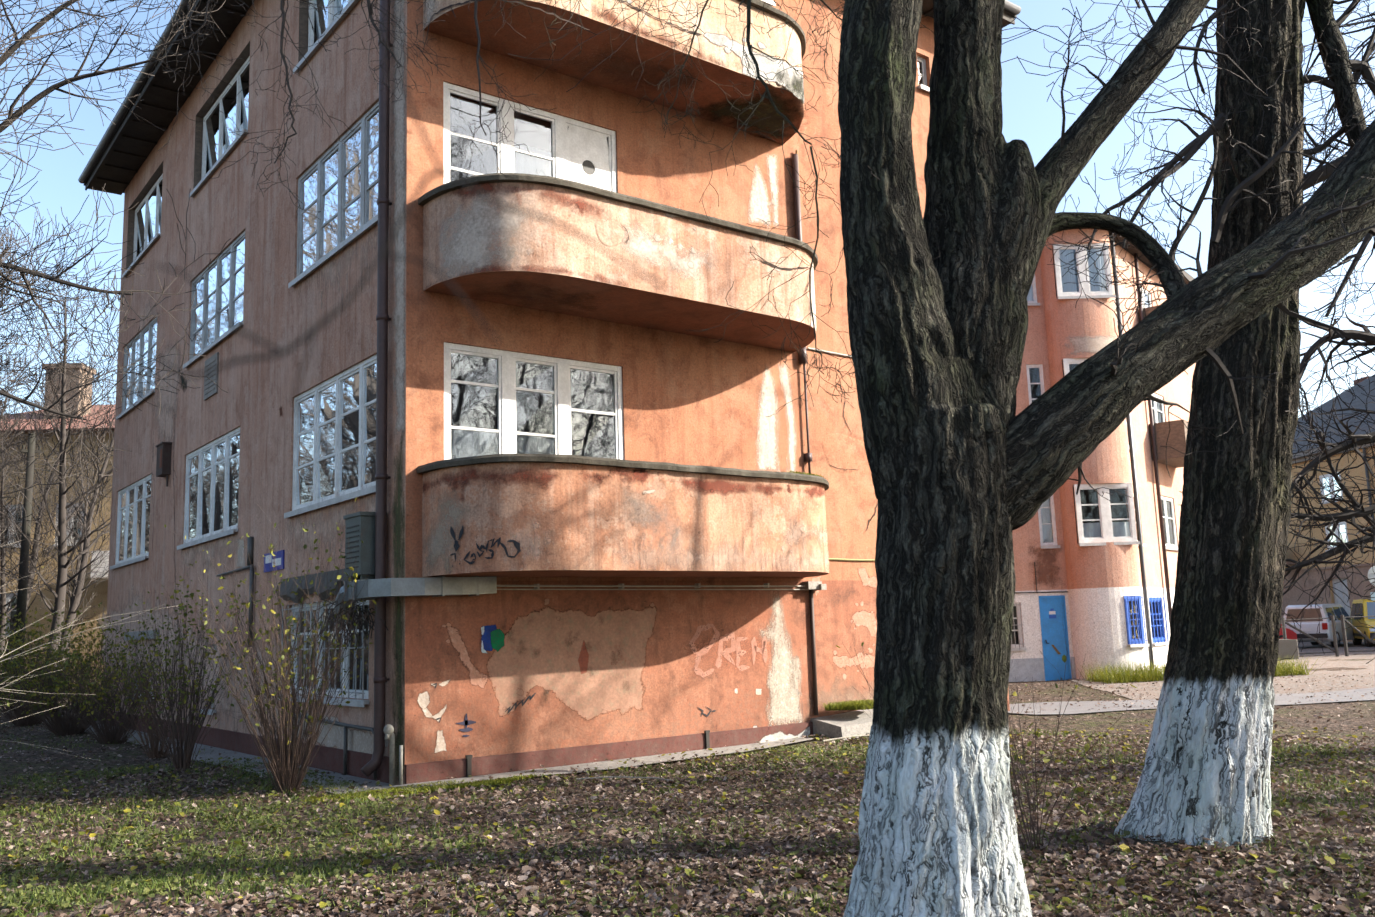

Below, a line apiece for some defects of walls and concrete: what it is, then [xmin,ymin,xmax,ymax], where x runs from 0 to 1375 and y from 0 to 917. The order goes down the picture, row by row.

spalling [703,32,805,104]
peeling [442,598,657,721]
peeling [417,679,451,753]